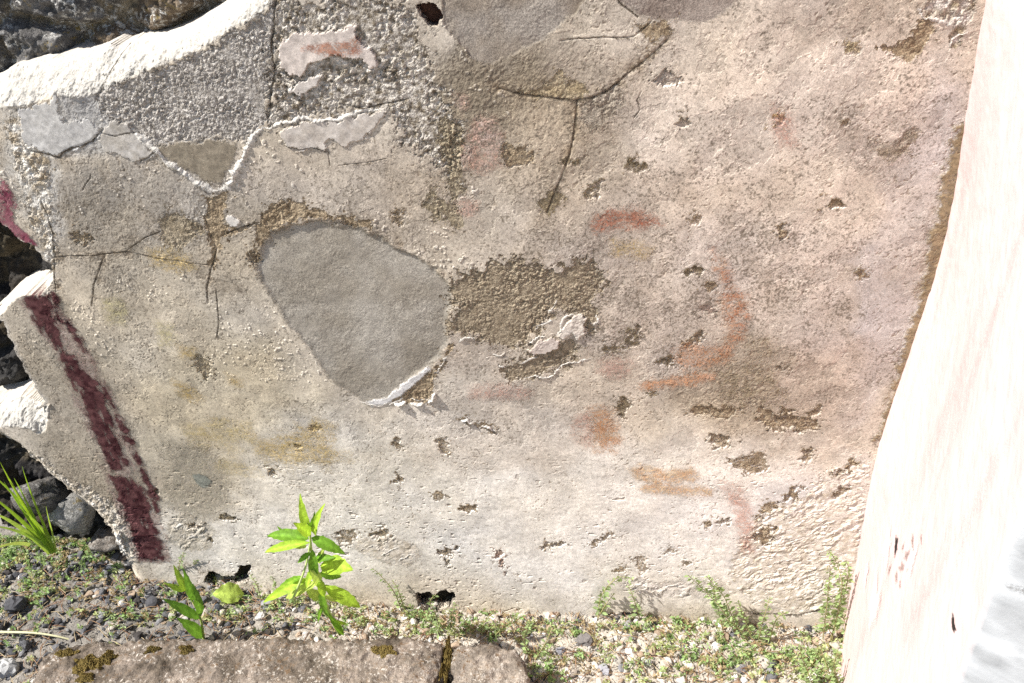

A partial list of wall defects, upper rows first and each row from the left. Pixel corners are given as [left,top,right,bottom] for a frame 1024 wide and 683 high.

crack [30,129,154,161]
crack [267,0,277,119]
peeling [95,0,474,233]
crack [500,0,666,213]
crack [39,200,257,336]
spalling [360,250,611,407]